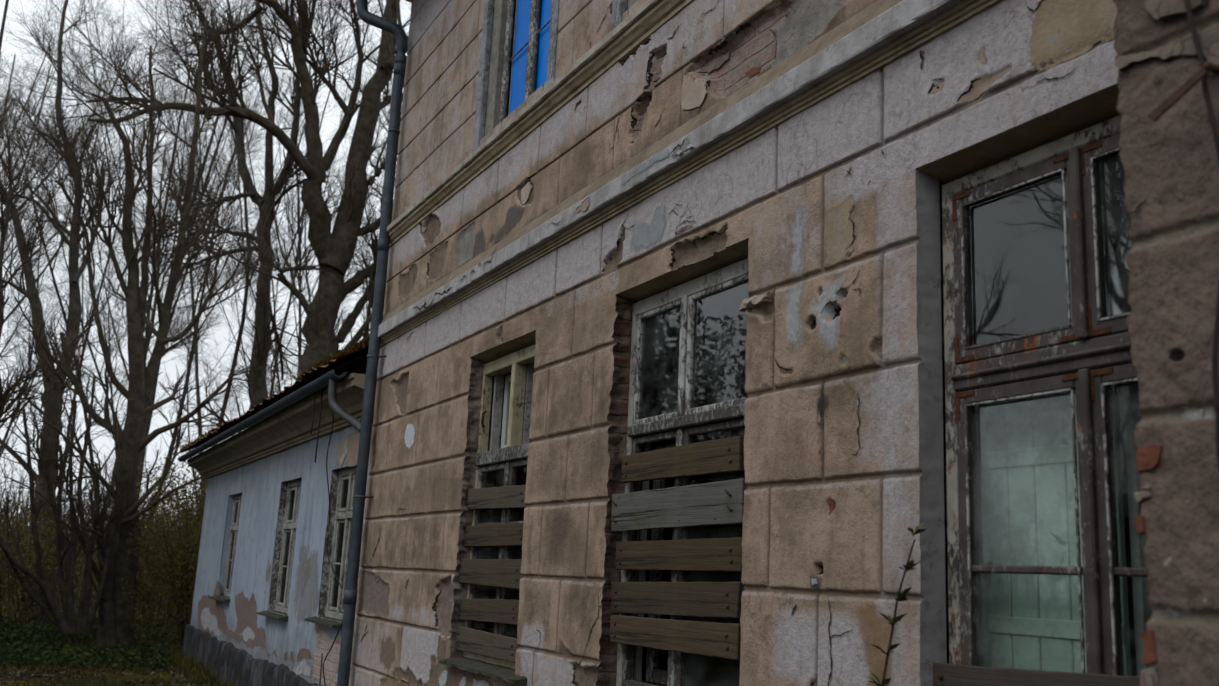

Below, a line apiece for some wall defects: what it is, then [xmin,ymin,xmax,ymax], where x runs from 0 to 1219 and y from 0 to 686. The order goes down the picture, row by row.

spalling [619,40,667,143]
spalling [681,1,791,114]
peeling [1027,0,1118,72]
peeling [1114,25,1219,72]
peeling [1144,0,1207,22]
spalling [517,174,534,206]
spalling [398,215,481,310]
spalling [669,220,728,270]
peeling [198,559,342,686]
peeling [379,577,493,686]
spalling [558,643,597,686]
crack [827,599,853,686]